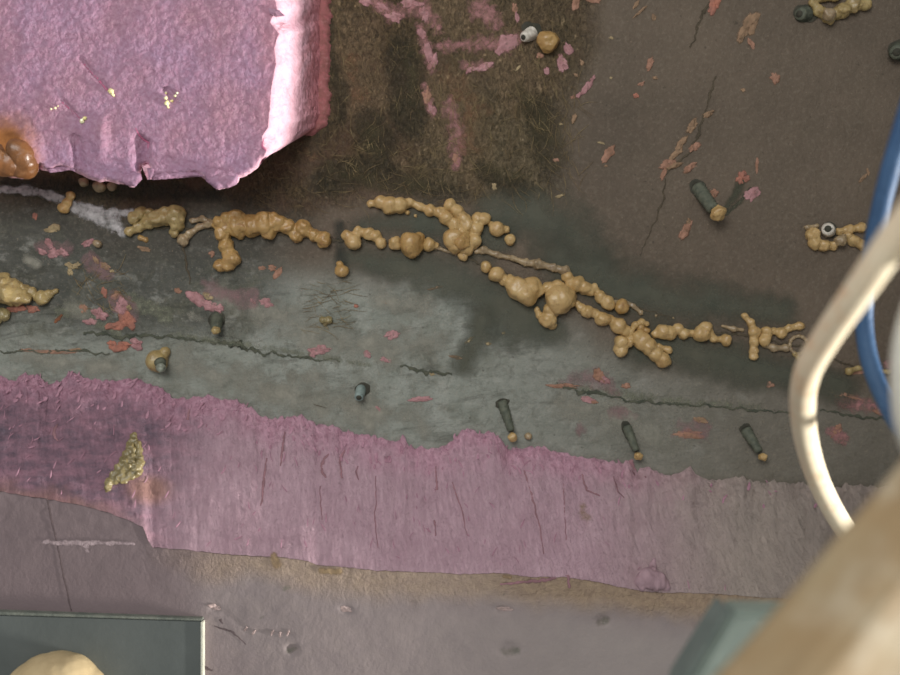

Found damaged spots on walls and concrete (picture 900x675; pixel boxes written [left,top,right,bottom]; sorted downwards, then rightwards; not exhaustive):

crack [641,76,717,254]
leakage [0,184,134,237]
crack [276,232,389,244]
leakage [359,211,449,238]
leakage [478,195,792,323]
leakage [337,222,564,373]
crack [0,331,340,362]
crack [400,364,452,376]
crack [557,383,790,414]
leakage [649,327,794,389]
crack [715,330,749,338]
leakage [817,370,877,410]